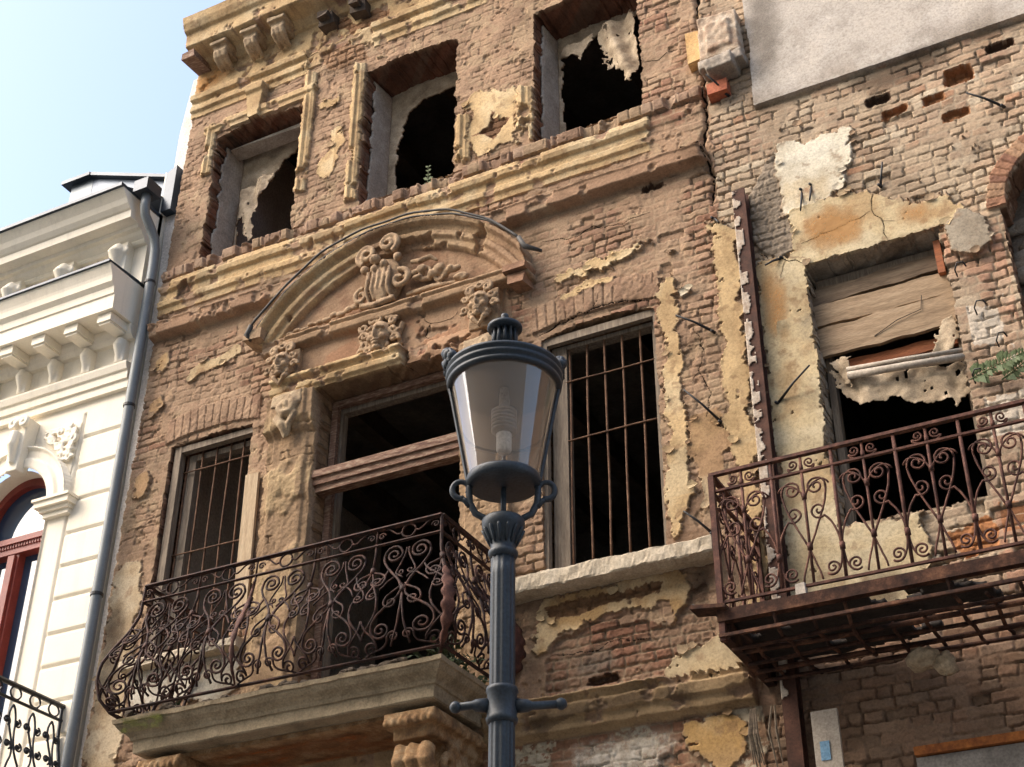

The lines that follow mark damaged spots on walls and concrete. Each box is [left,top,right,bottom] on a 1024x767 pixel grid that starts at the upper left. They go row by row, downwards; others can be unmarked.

flaking render [318,95,341,109]
flaking render [316,124,347,179]
flaking render [460,84,518,168]
crack [697,79,722,206]
crack [758,194,893,277]
flaking render [554,237,677,301]
flaking render [186,342,244,382]
flaking render [654,119,965,604]
spalling [530,569,744,696]
peeling [778,660,788,699]
flaking render [682,708,750,767]